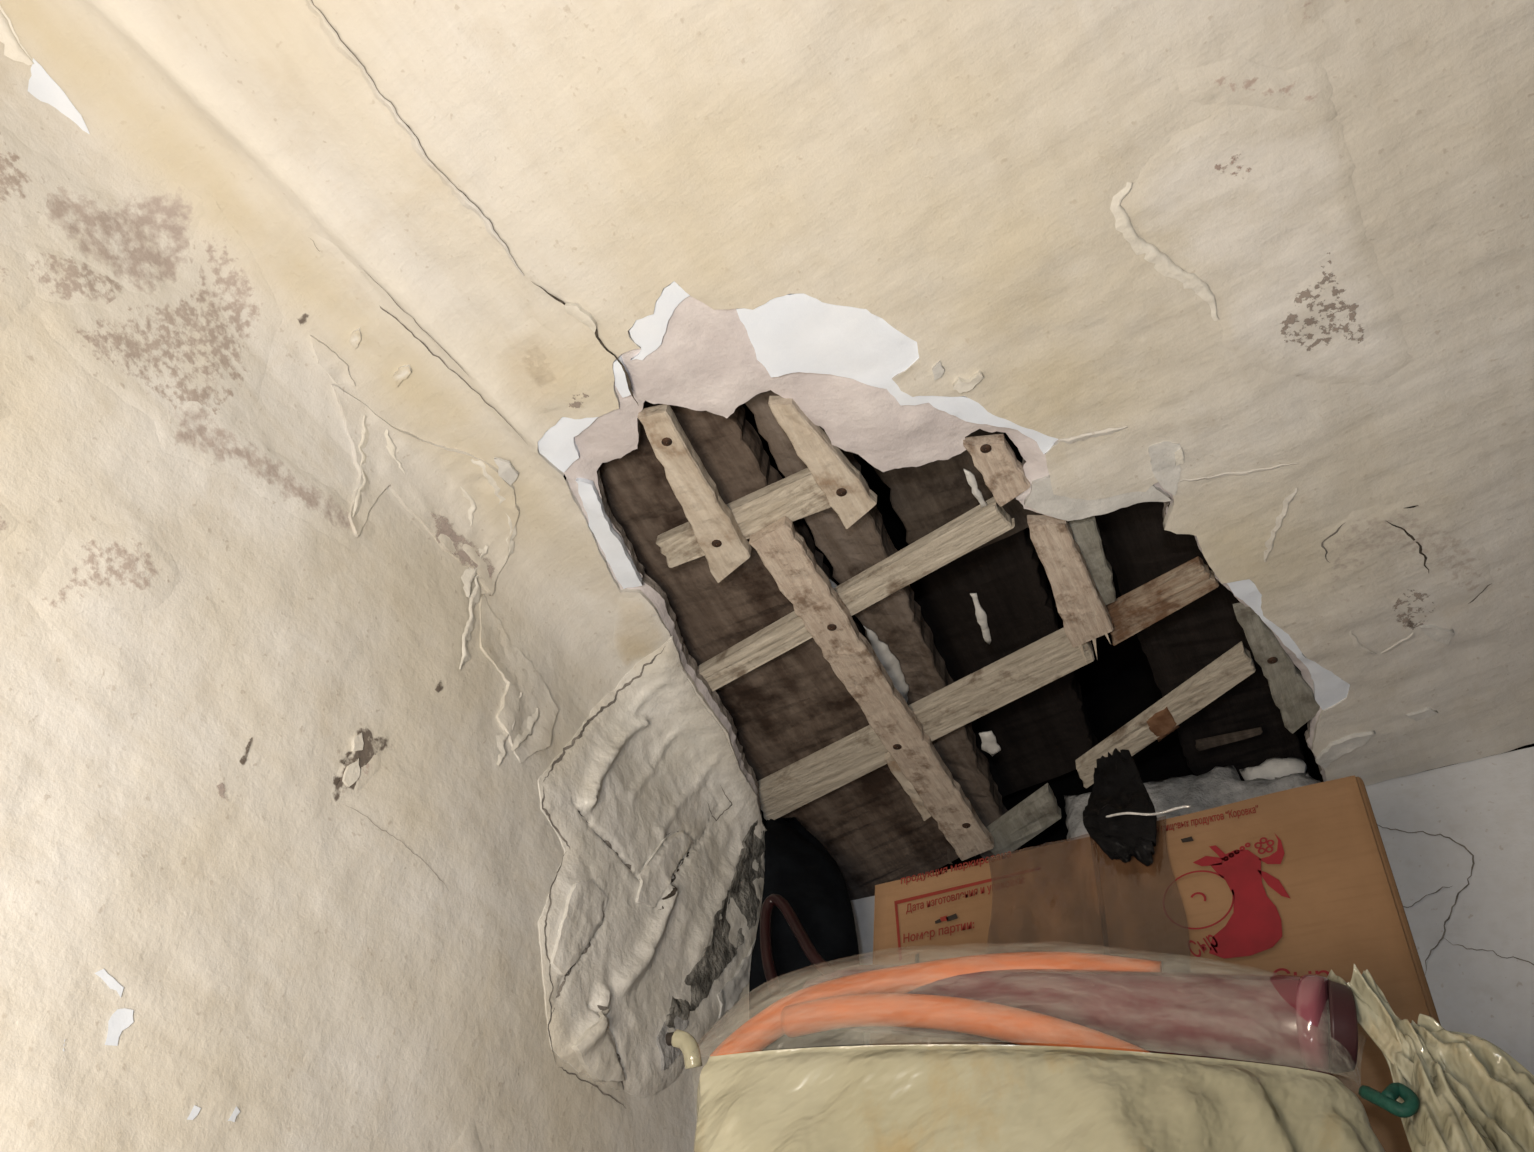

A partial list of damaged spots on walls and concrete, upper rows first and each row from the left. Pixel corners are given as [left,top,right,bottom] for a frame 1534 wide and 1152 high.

peeling [28,58,90,134]
crack [306,0,639,408]
crack [376,282,524,440]
damp [1281,261,1364,351]
spalling [330,722,390,805]
spalling [538,281,1173,1071]
spalling [1143,571,1375,819]
crack [1377,824,1534,974]